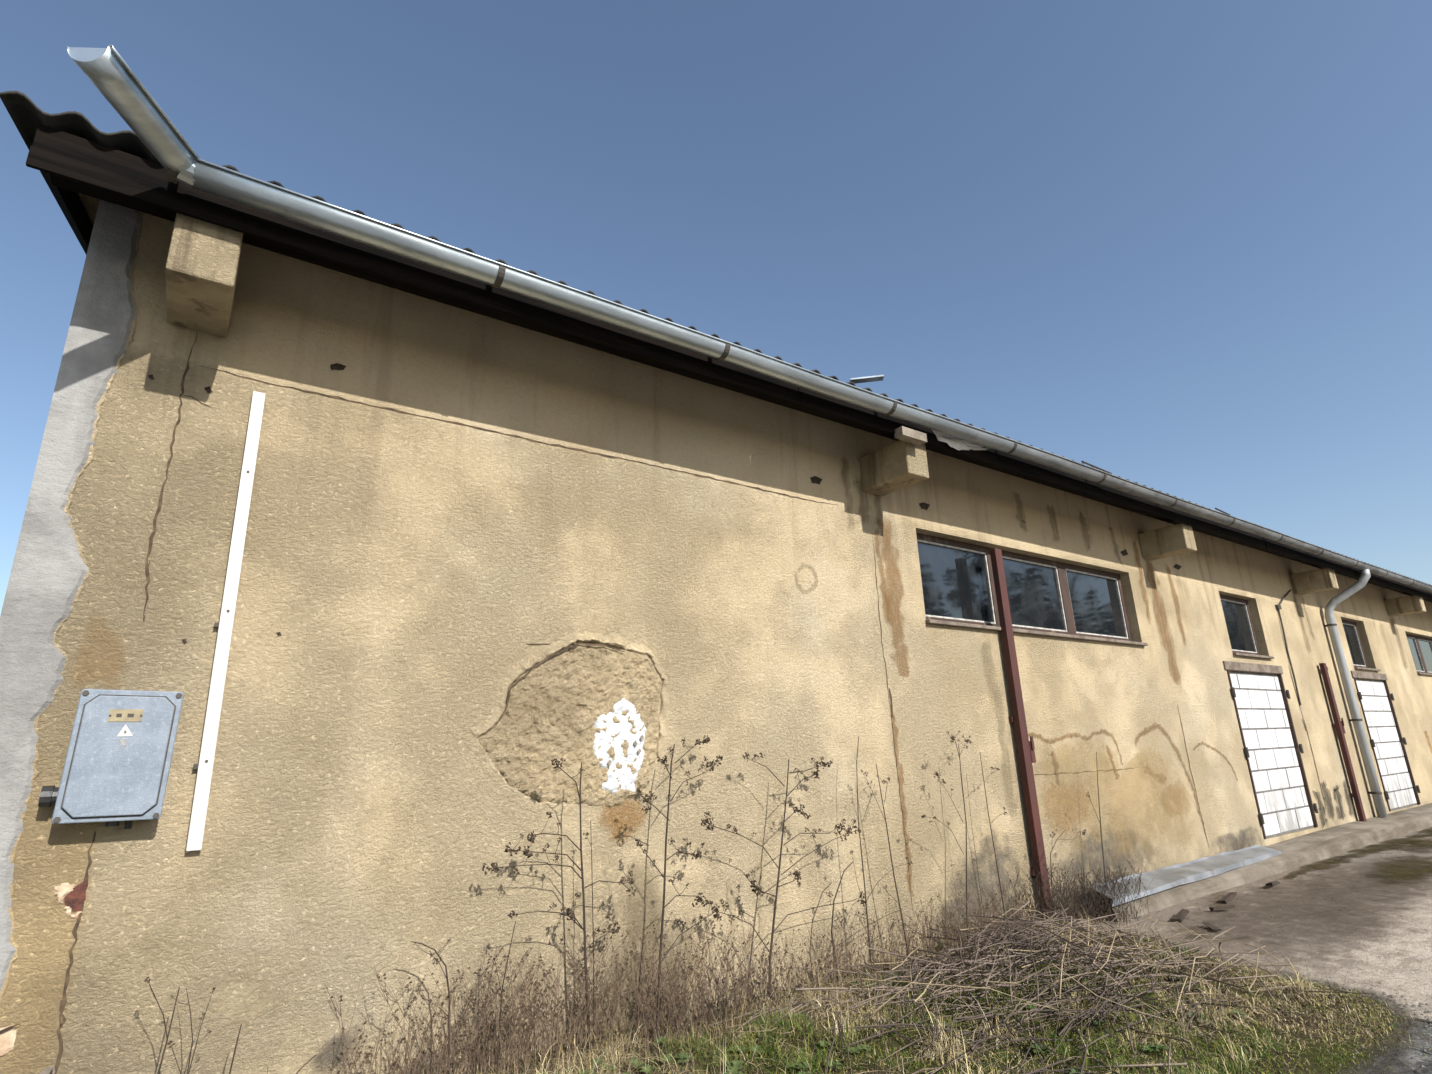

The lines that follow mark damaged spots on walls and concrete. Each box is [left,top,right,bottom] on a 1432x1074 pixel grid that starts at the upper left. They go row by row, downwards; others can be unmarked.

crack [143,334,836,622]
rust [876,523,908,676]
crack [1017,767,1143,778]
flaking render [54,879,88,921]
crack [54,831,96,1074]
flaking render [0,1025,17,1056]